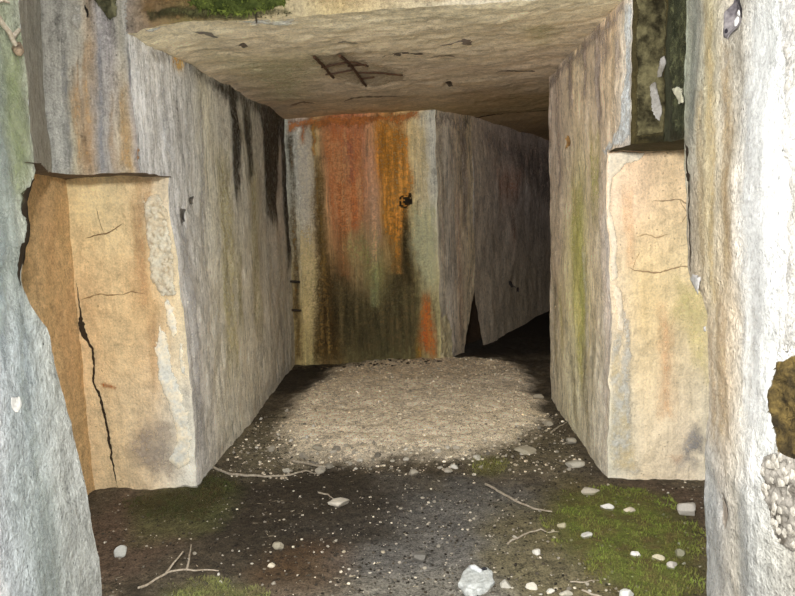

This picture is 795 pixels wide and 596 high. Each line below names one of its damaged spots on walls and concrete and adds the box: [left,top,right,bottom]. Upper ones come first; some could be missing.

peeling [650,56,666,121]
peeling [672,87,684,104]
crack [17,178,35,285]
crack [87,208,121,238]
leakage [199,72,420,361]
rust [288,112,417,258]
crack [631,141,691,274]
rust [418,298,436,359]
crack [76,284,145,482]
spalling [760,452,795,551]